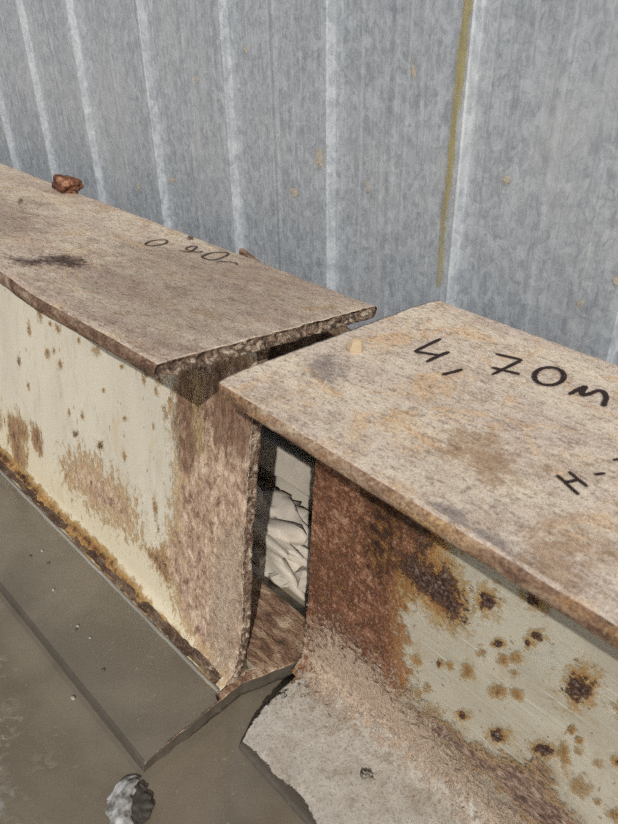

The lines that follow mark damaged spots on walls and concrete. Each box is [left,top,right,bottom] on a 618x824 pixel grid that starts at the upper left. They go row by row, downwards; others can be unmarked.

rust [7,253,87,267]
leakage [437,0,472,285]
rust [0,353,257,688]
rust [282,459,618,824]